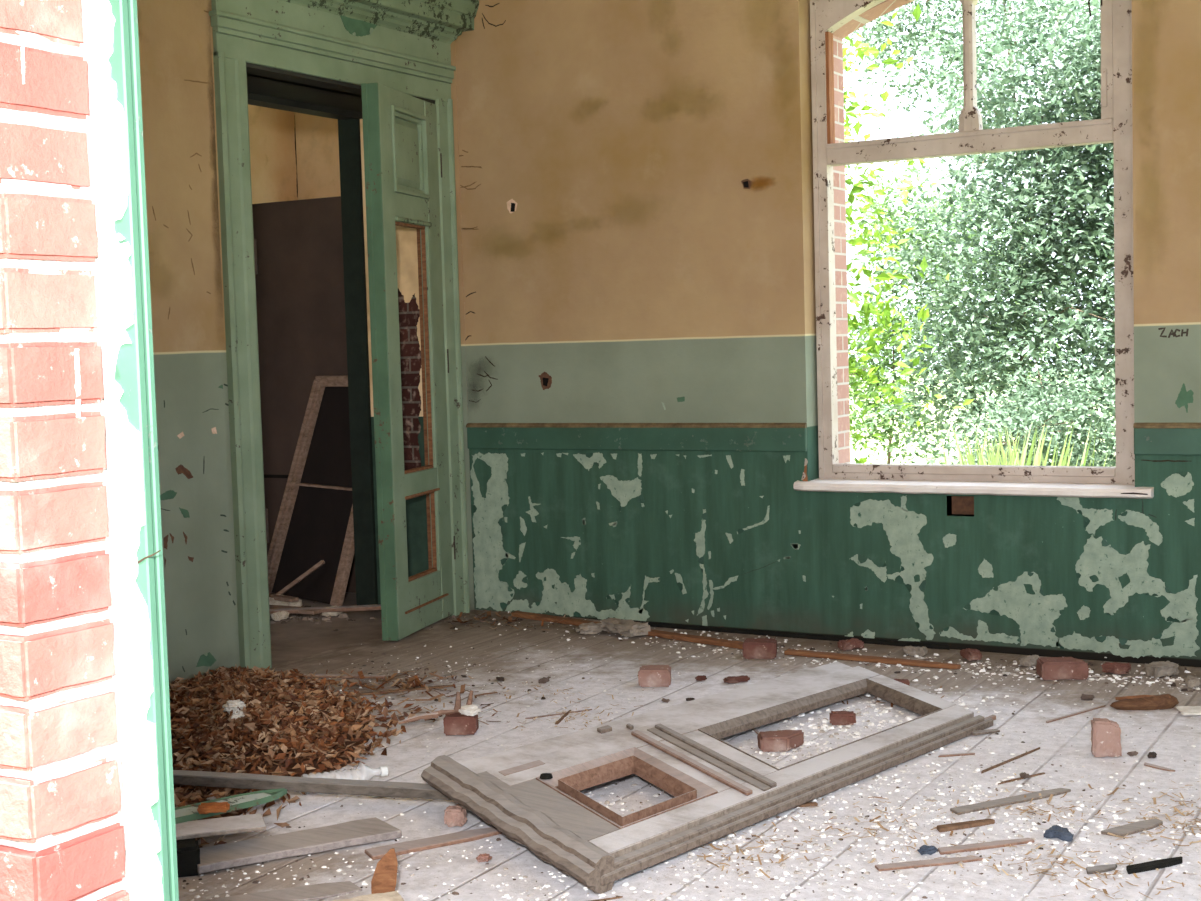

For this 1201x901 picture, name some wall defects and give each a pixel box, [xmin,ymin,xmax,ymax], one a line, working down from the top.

peeling [340,15,377,37]
spalling [677,454,745,486]
peeling [470,452,687,621]
peeling [725,496,770,544]
peeling [1161,472,1195,526]
peeling [685,508,738,626]
peeling [850,495,1200,658]
spalling [845,629,875,639]